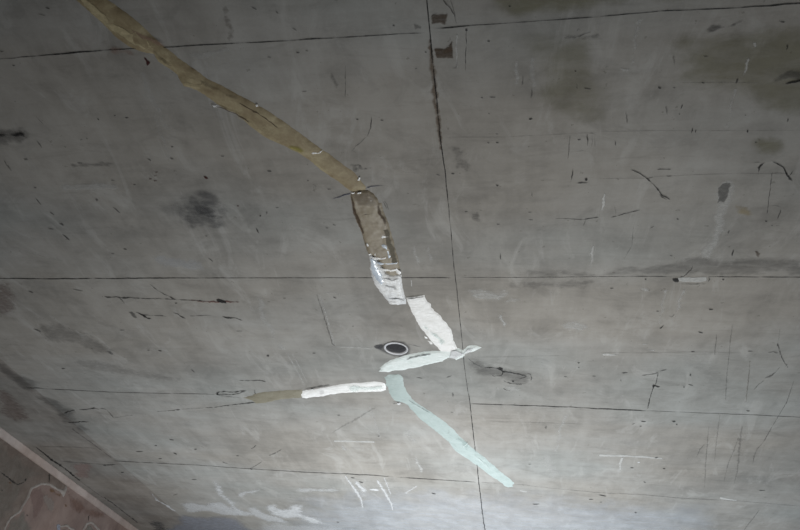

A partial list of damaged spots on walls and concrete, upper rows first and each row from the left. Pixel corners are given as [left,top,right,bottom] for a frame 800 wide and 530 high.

crack [77,0,401,276]
crack [107,285,237,319]
crack [210,380,303,408]
crack [488,367,532,391]